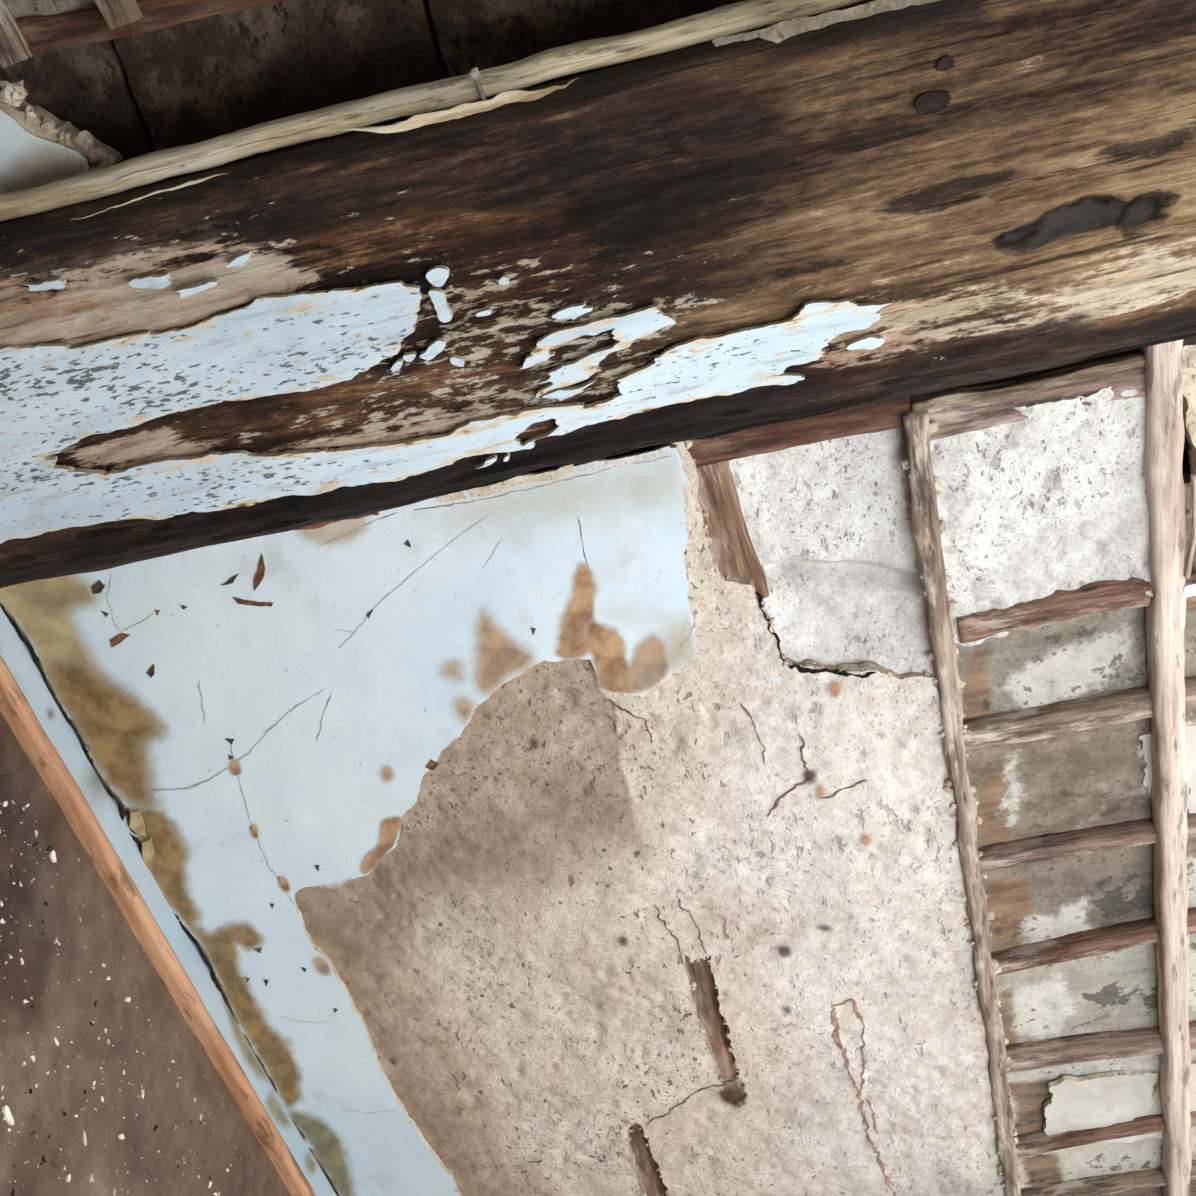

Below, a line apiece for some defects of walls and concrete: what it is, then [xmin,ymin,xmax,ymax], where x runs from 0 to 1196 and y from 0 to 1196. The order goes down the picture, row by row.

peeling [129,251,251,298]
peeling [0,265,893,544]
water stain [476,615,533,693]
water stain [556,564,692,694]
crack [755,591,876,678]
water stain [382,767,393,781]
water stain [0,574,353,1196]
water stain [322,817,403,887]
spalling [278,440,1004,1196]
crack [654,899,707,955]
crack [647,1079,735,1126]
flaking render [1043,1069,1158,1136]